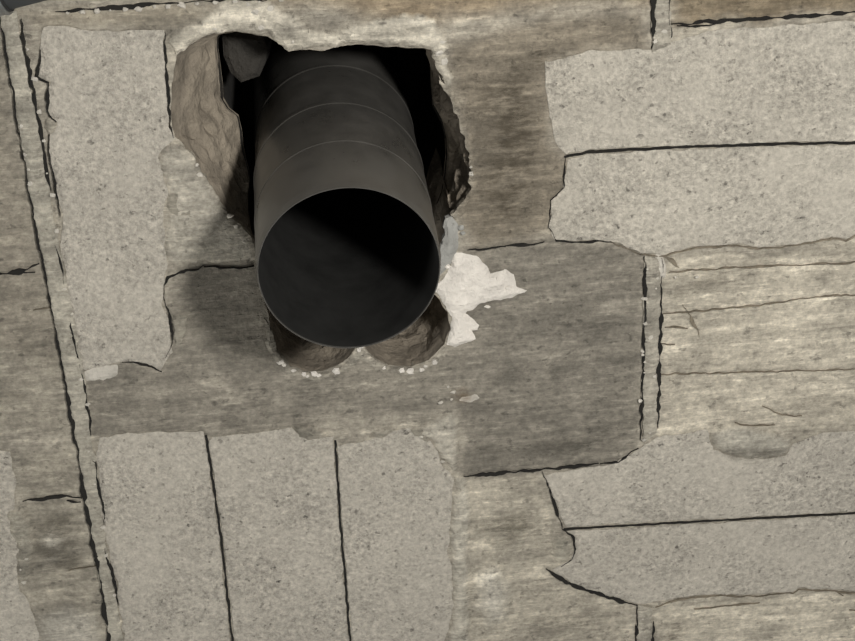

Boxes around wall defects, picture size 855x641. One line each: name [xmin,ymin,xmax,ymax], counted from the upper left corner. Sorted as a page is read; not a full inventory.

crack [164,33,174,138]
spalling [159,0,477,265]
crack [0,18,118,641]
crack [122,265,254,372]
spalling [263,294,472,383]
peeling [294,424,327,440]
peeling [368,385,480,473]
crack [464,158,855,641]